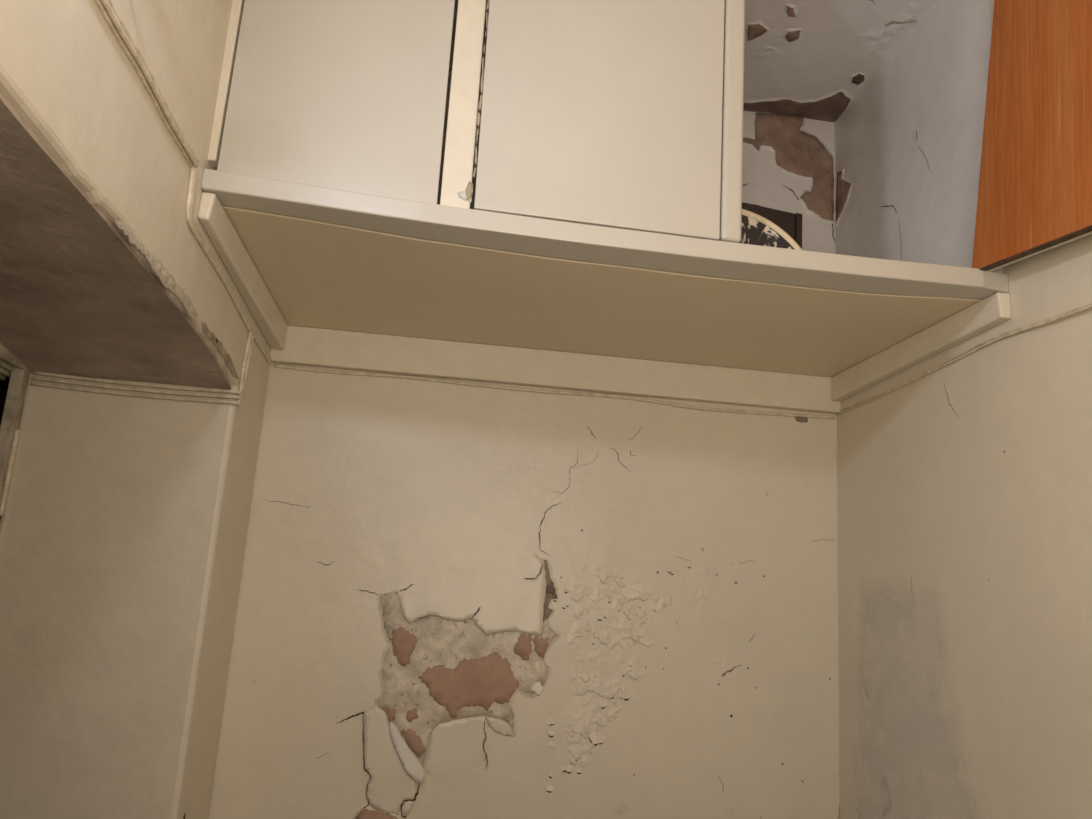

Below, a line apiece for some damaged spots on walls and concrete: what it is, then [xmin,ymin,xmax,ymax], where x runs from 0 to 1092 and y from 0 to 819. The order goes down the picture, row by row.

peeling [744,4,803,63]
peeling [743,71,867,242]
spalling [115,219,238,379]
crack [538,426,642,556]
peeling [336,553,561,819]